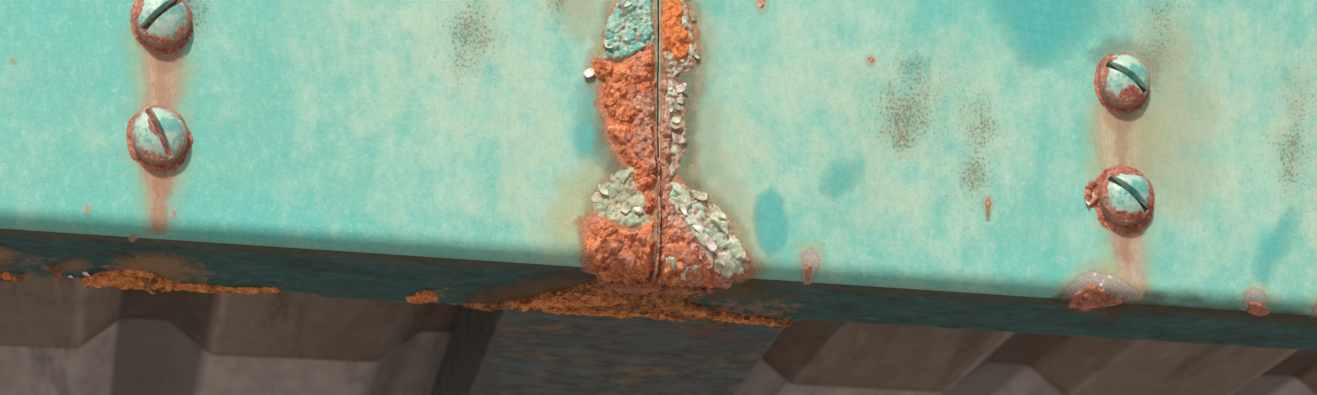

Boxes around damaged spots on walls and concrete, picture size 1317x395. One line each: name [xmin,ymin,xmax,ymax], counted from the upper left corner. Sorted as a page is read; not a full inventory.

corrosion [126,0,194,230]
corrosion [1060,54,1155,312]